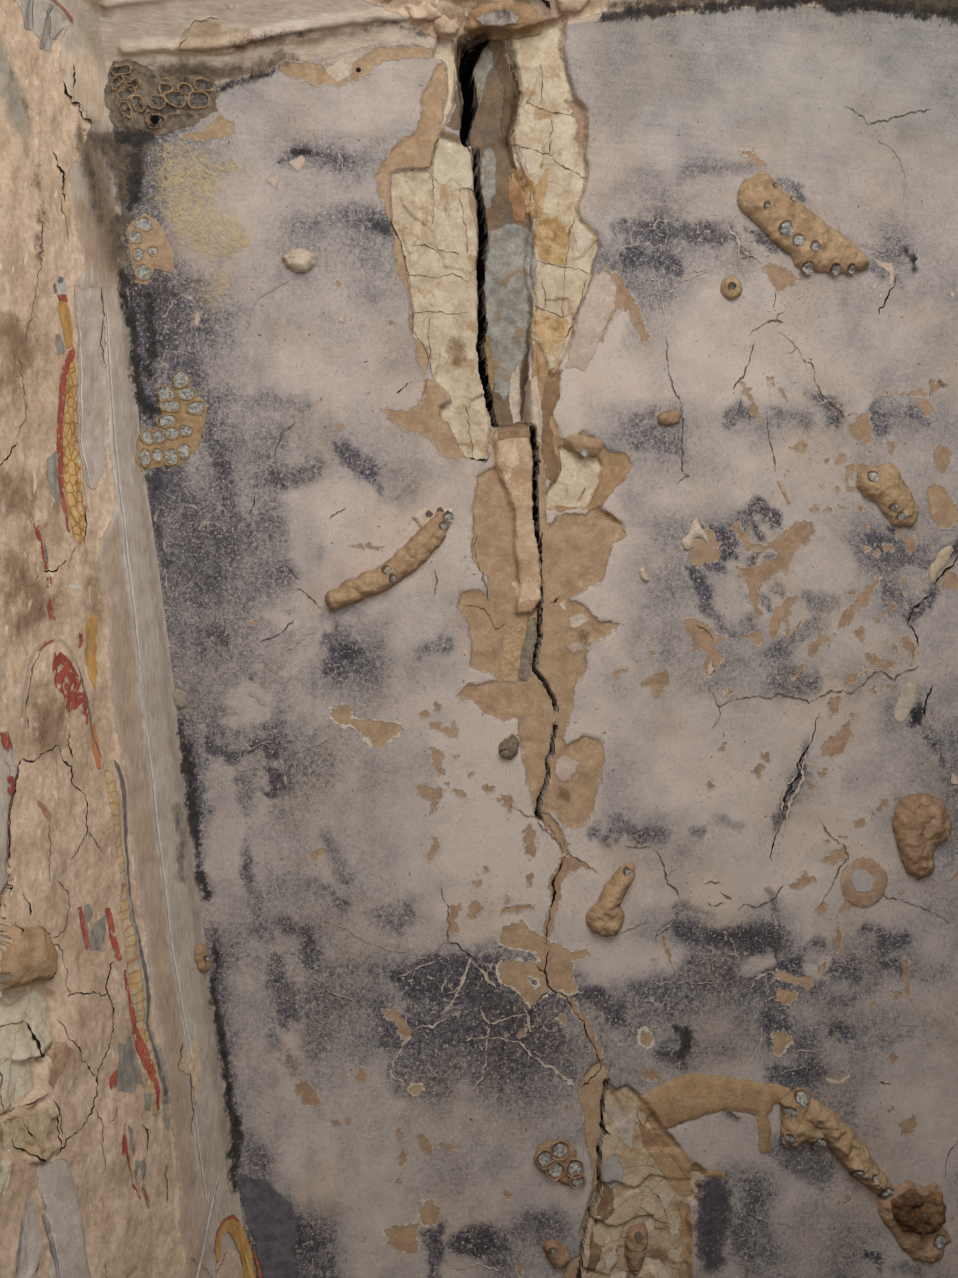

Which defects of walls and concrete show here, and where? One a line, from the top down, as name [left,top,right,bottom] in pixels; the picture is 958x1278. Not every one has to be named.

damp [111,128,145,276]
damp [140,293,160,380]
crack [459,38,496,427]
flaking render [739,380,762,421]
flaking render [763,372,789,403]
flaking render [761,261,804,294]
flaking render [0,0,253,1278]
flaking render [279,0,702,1278]
crack [332,426,610,1209]
crack [615,556,958,939]
damp [210,928,222,984]
flaking render [769,1028,793,1057]